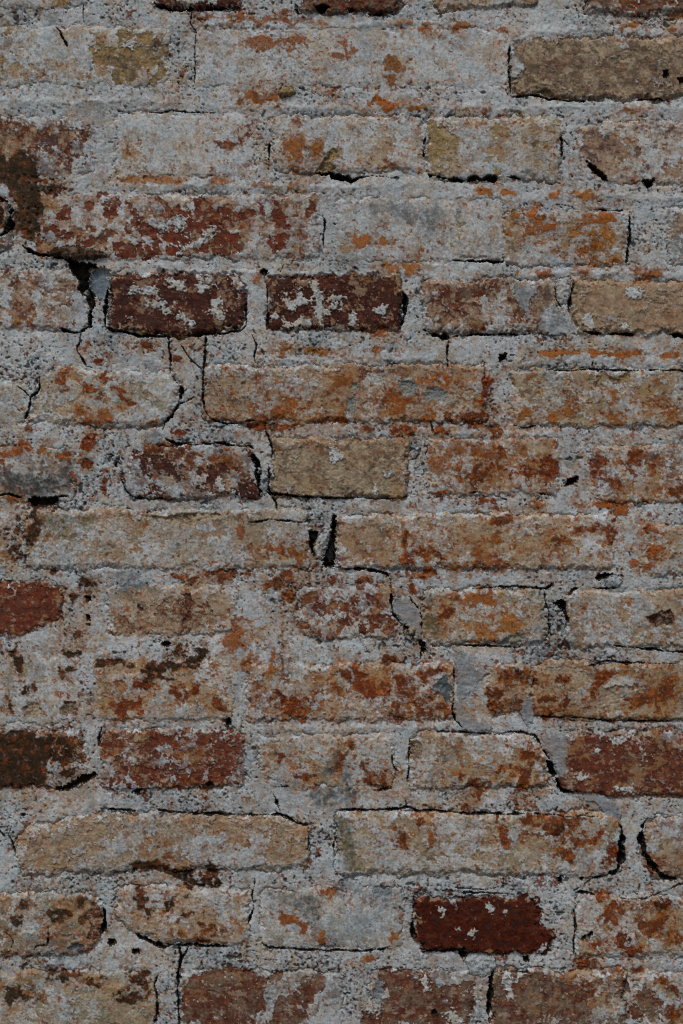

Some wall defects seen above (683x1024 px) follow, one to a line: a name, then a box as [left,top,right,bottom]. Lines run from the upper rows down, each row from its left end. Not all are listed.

crack [20,380,40,420]
crack [61,266,405,523]
crack [436,644,683,759]
crack [341,740,683,951]